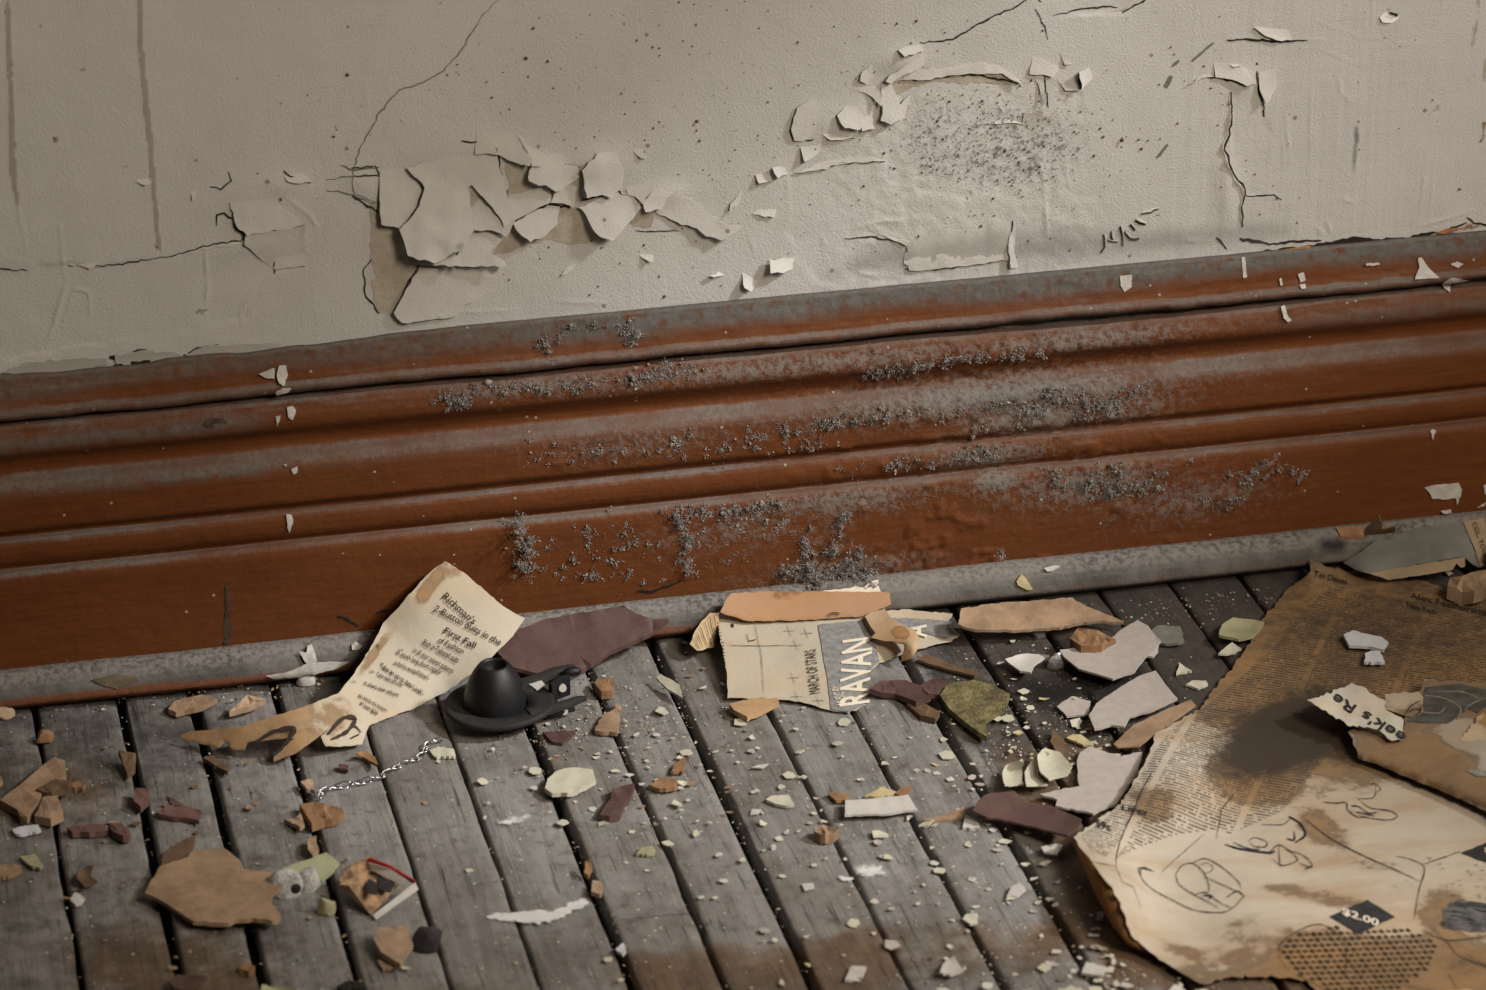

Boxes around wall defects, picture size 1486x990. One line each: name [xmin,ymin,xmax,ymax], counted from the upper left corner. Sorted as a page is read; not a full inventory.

crack [920,0,1117,43]
peeling [1109,0,1145,13]
peeling [1227,27,1307,43]
crack [326,1,497,204]
peeling [755,43,1093,184]
peeling [1189,62,1277,104]
crack [1216,71,1282,249]
crack [68,172,303,267]
peeling [351,128,776,323]
peeling [844,221,1019,271]
peeling [742,258,795,292]